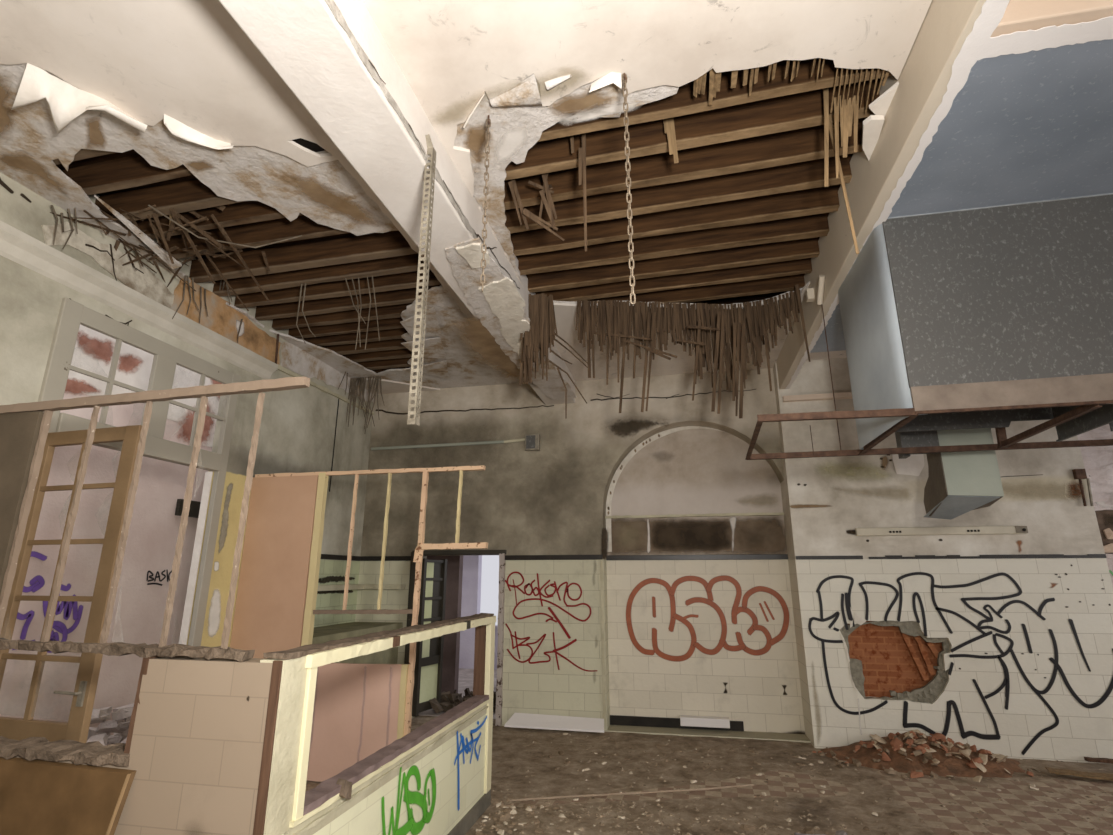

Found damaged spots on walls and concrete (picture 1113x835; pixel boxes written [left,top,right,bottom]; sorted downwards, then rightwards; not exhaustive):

spalling [844,0,1113,280]
spalling [0,63,679,403]
spalling [785,293,839,389]
peeling [167,364,222,447]
spalling [1095,510,1113,554]
spalling [840,607,961,703]